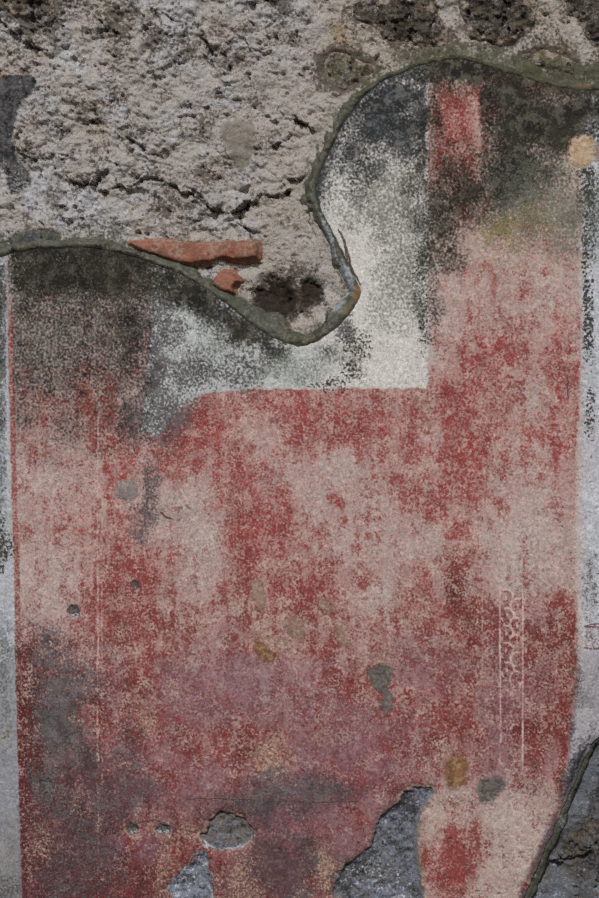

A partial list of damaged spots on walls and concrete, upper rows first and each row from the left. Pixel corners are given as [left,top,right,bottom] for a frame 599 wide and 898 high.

peeling [0,0,599,347]
spalling [167,810,255,898]
spalling [334,786,433,898]
peeling [525,738,599,898]